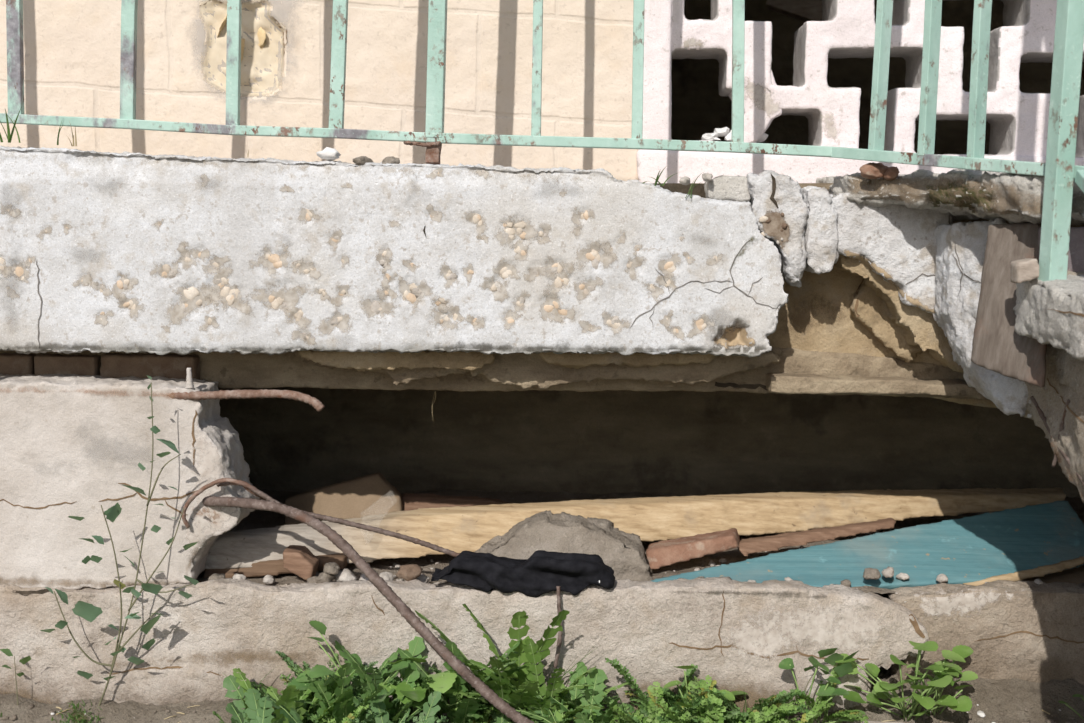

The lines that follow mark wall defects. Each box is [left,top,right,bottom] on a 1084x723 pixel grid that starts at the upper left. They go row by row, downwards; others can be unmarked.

peeling [200,0,227,92]
peeling [240,1,285,96]
crack [35,261,43,347]
spalling [73,273,143,326]
spalling [150,208,723,346]
crack [630,239,778,328]
spalling [659,310,755,348]
spalling [844,250,936,313]
crack [0,410,212,520]
spalling [187,438,237,562]
crack [669,591,868,664]
crack [974,631,1084,644]